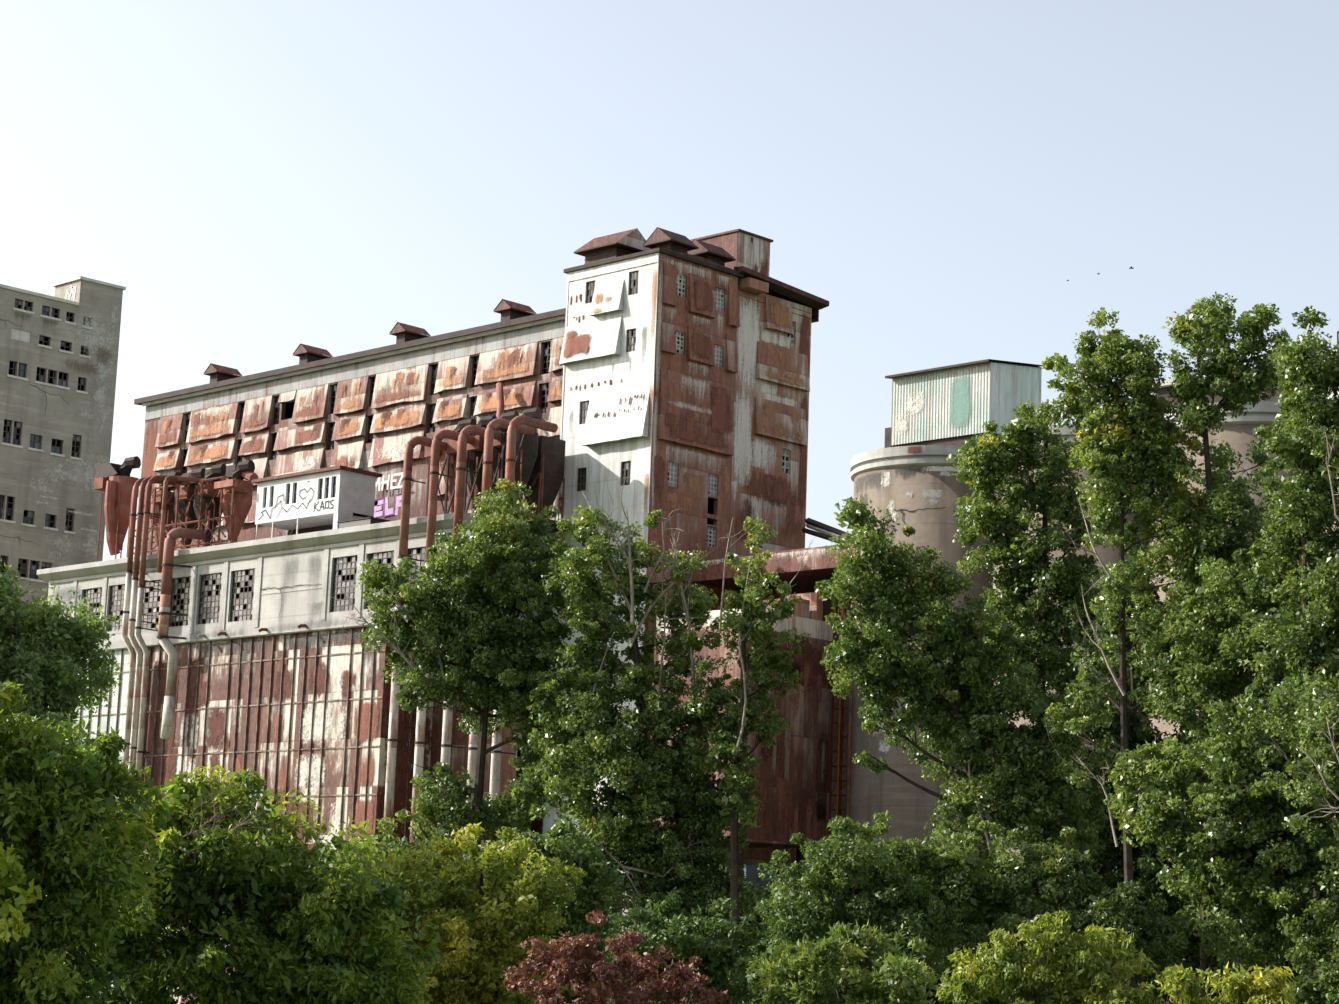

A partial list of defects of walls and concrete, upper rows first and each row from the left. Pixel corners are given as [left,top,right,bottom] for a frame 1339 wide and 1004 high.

corrosion [295,389,321,442]
corrosion [335,371,419,435]
corrosion [437,366,461,418]
corrosion [480,349,528,410]
corrosion [551,292,732,518]
corrosion [722,395,808,542]
corrosion [771,303,810,370]
corrosion [164,668,179,795]
corrosion [193,669,243,787]
corrosion [255,659,432,853]
corrosion [744,633,829,844]